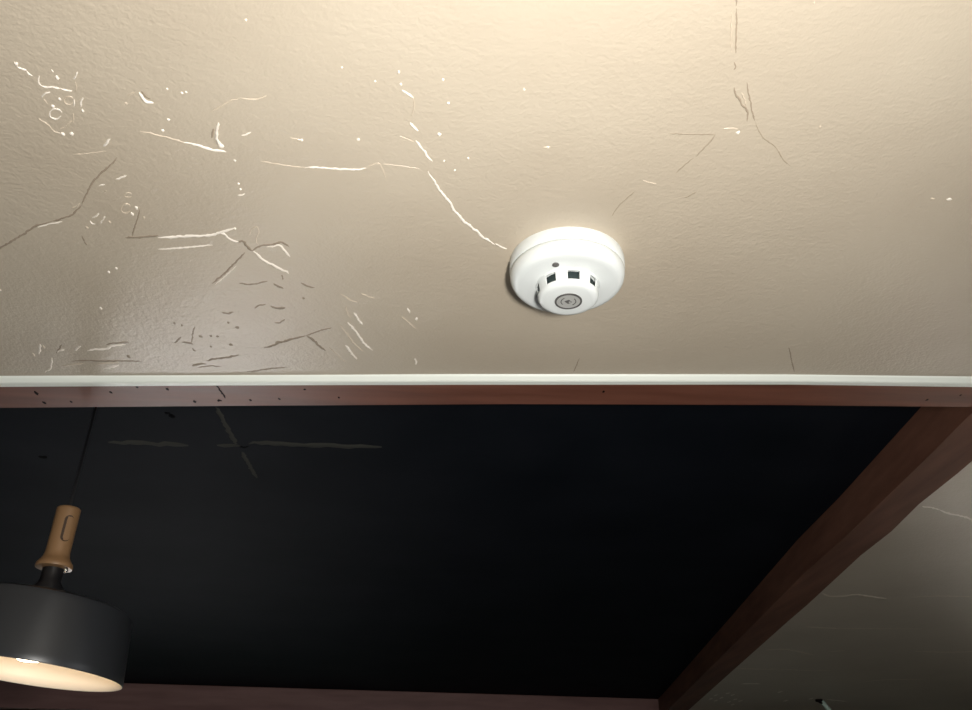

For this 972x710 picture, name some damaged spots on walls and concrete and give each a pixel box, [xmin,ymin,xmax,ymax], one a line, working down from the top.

crack [0,158,117,249]
crack [125,210,290,285]
crack [374,71,506,249]
crack [670,0,790,173]